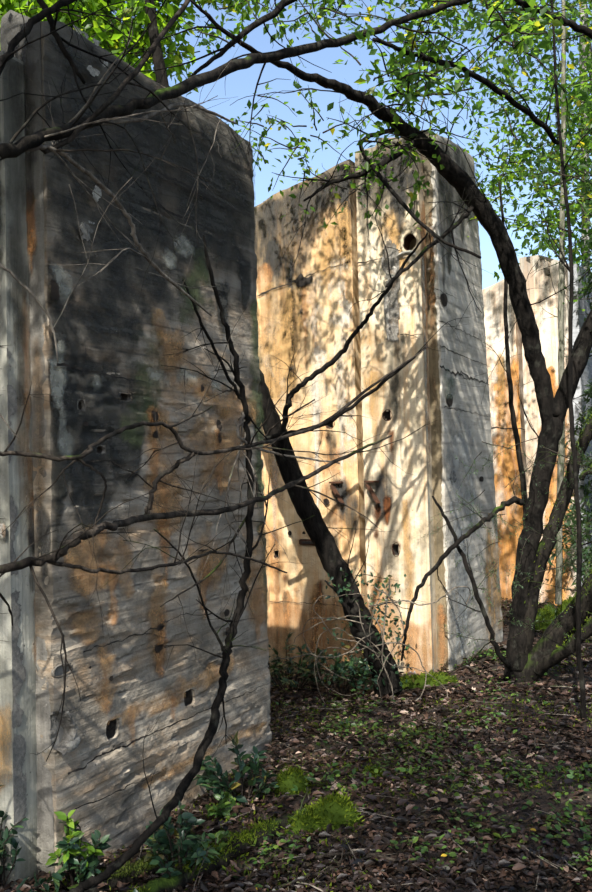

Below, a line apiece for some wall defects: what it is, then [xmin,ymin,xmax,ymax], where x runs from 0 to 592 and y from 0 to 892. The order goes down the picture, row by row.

water stain [0,20,31,142]
water stain [0,151,36,346]
rust [318,209,351,278]
water stain [28,98,418,588]
rust [266,289,306,405]
rust [147,407,180,561]
rust [65,535,105,595]
rust [246,558,360,669]
crack [68,684,267,775]